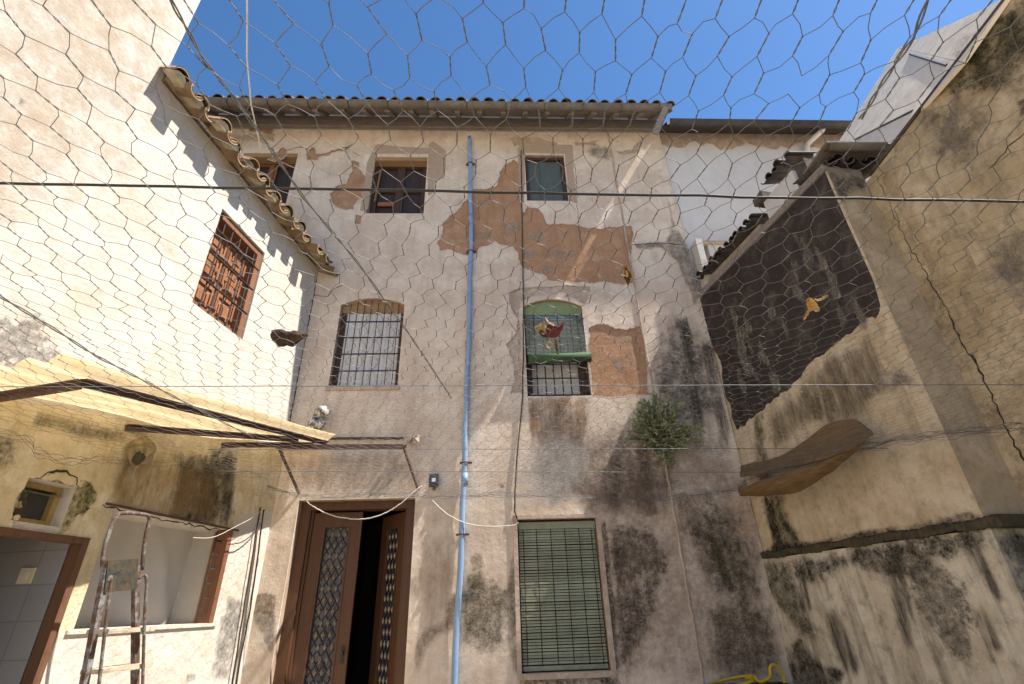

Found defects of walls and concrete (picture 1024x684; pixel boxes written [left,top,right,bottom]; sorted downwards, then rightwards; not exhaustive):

damp [952,9,1024,94]
peeling [305,142,446,225]
peeling [436,136,635,394]
crack [876,175,1024,461]
peeling [588,323,650,399]
damp [658,318,727,441]
spalling [37,478,97,534]
damp [115,450,236,522]
damp [525,524,666,684]
damp [766,498,999,658]
damp [787,616,857,684]